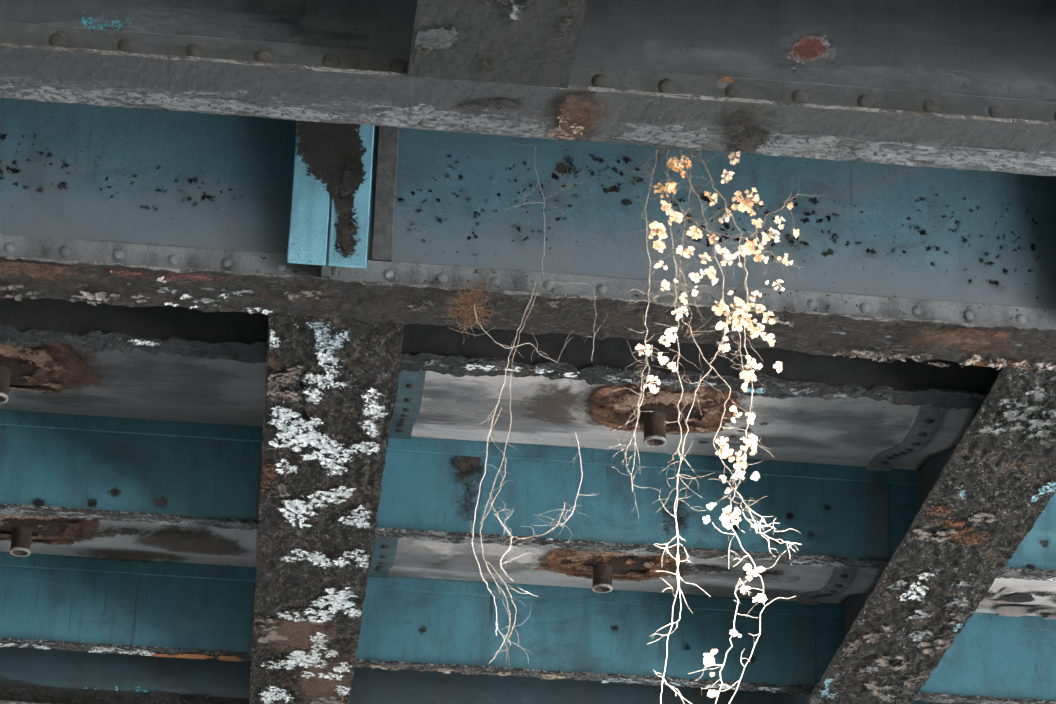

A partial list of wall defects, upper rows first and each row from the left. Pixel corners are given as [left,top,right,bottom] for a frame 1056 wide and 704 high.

corrosion [787,29,831,71]
corrosion [543,92,609,141]
peeling [465,363,579,378]
peeling [602,374,679,387]
peeling [0,499,106,520]
peeling [143,496,201,527]
peeling [619,548,667,556]